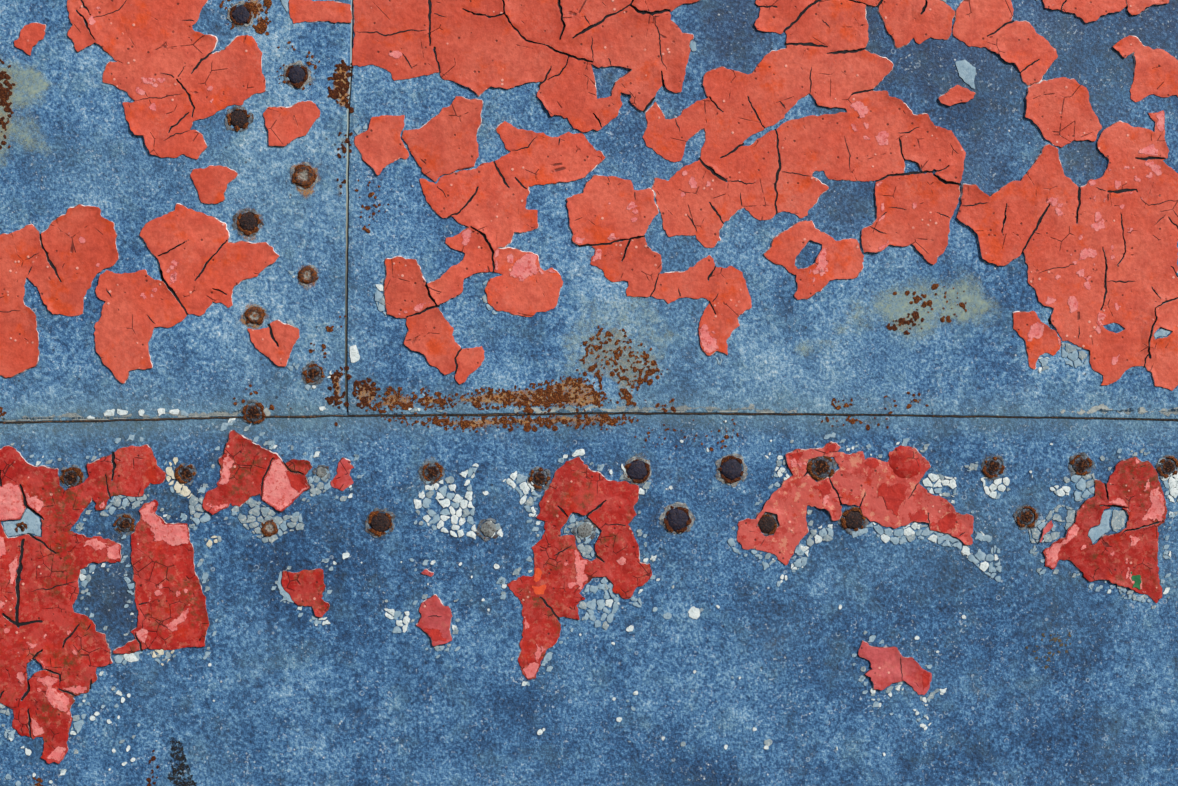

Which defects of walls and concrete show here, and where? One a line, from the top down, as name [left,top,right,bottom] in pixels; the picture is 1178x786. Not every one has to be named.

rust [0,59,16,149]
crack [0,470,92,738]
crack [105,451,116,499]
peeling [0,0,279,384]
peeling [0,418,364,783]
crack [261,458,304,499]
rust [327,59,354,113]
rust [303,315,744,484]
peeling [494,449,674,686]
crack [0,0,1178,423]
peeling [281,0,1178,391]
rust [885,284,967,335]